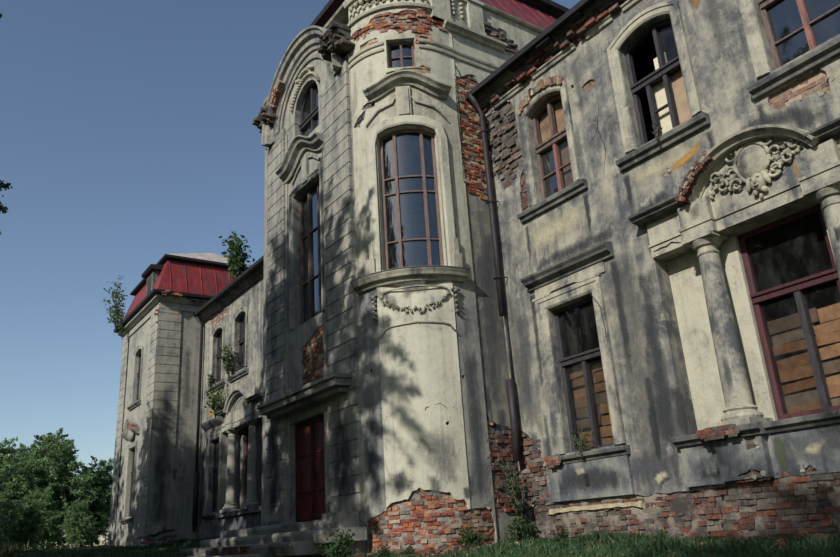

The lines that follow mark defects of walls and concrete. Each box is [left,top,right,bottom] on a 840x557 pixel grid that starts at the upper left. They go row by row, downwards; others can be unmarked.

flaking render [351,8,447,49]
flaking render [484,21,518,54]
flaking render [769,68,840,110]
flaking render [454,73,528,212]
flaking render [300,325,325,386]
leakage [611,261,685,482]
leakage [154,388,177,518]
flaking render [365,421,562,553]
flaking render [696,423,760,449]
flaking render [737,468,772,482]